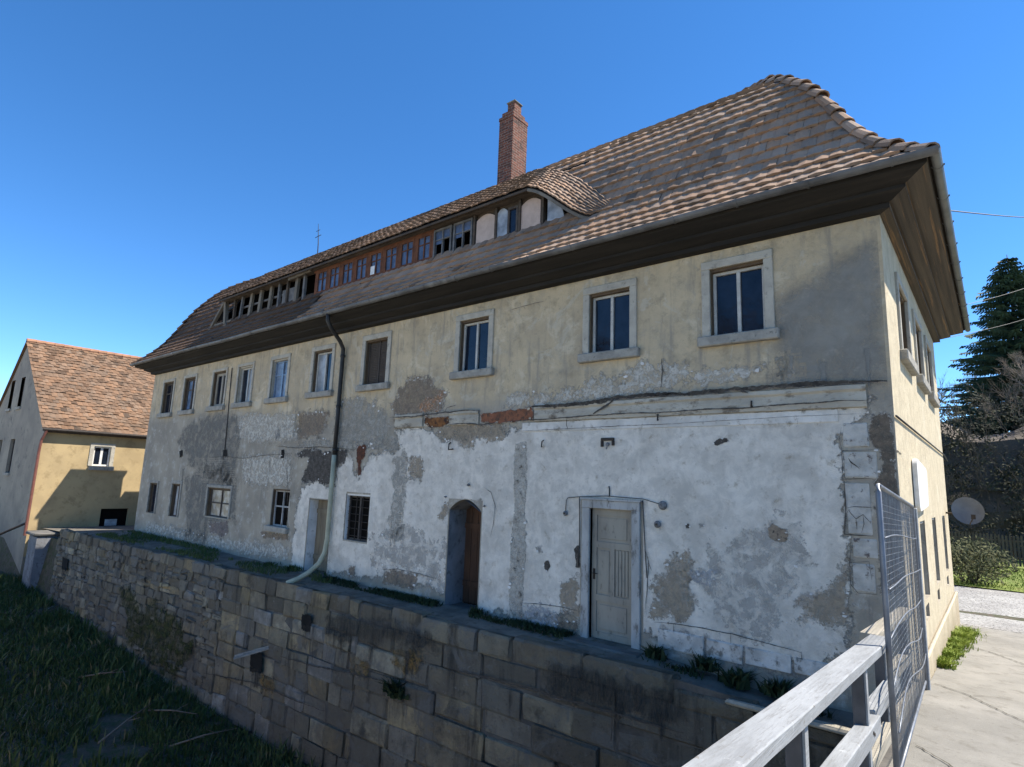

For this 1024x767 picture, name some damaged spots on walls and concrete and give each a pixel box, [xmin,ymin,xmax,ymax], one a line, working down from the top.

peeling [504,357,784,419]
rust [356,444,366,476]
flaking render [240,375,508,594]
flaking render [551,545,580,629]
flaking render [648,511,854,644]